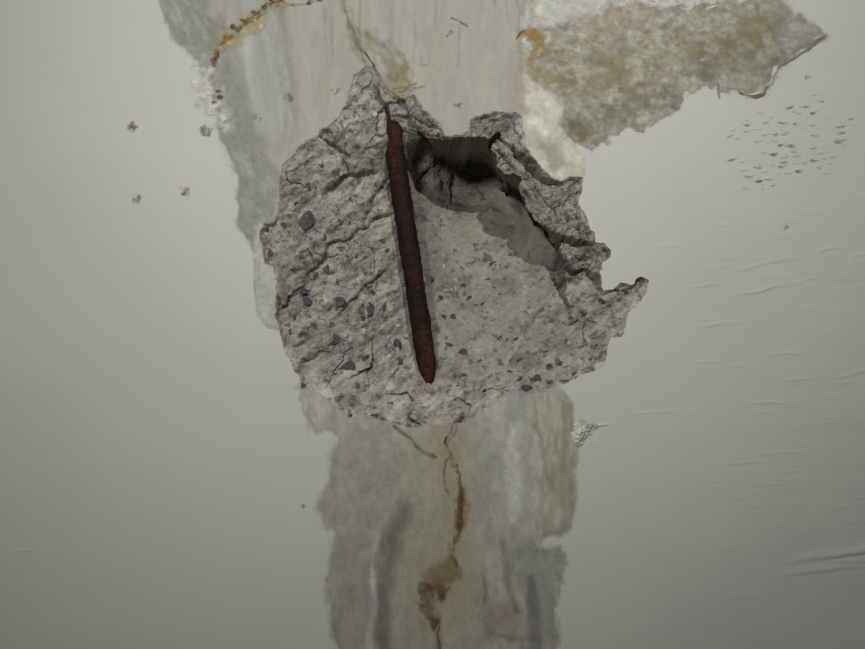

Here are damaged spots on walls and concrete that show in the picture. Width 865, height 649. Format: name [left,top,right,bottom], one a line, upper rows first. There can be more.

rust [210,0,291,66]
peeling [526,0,827,149]
spalling [259,67,648,428]
crack [393,425,463,539]
water stain [299,385,578,649]
rust [420,479,470,628]